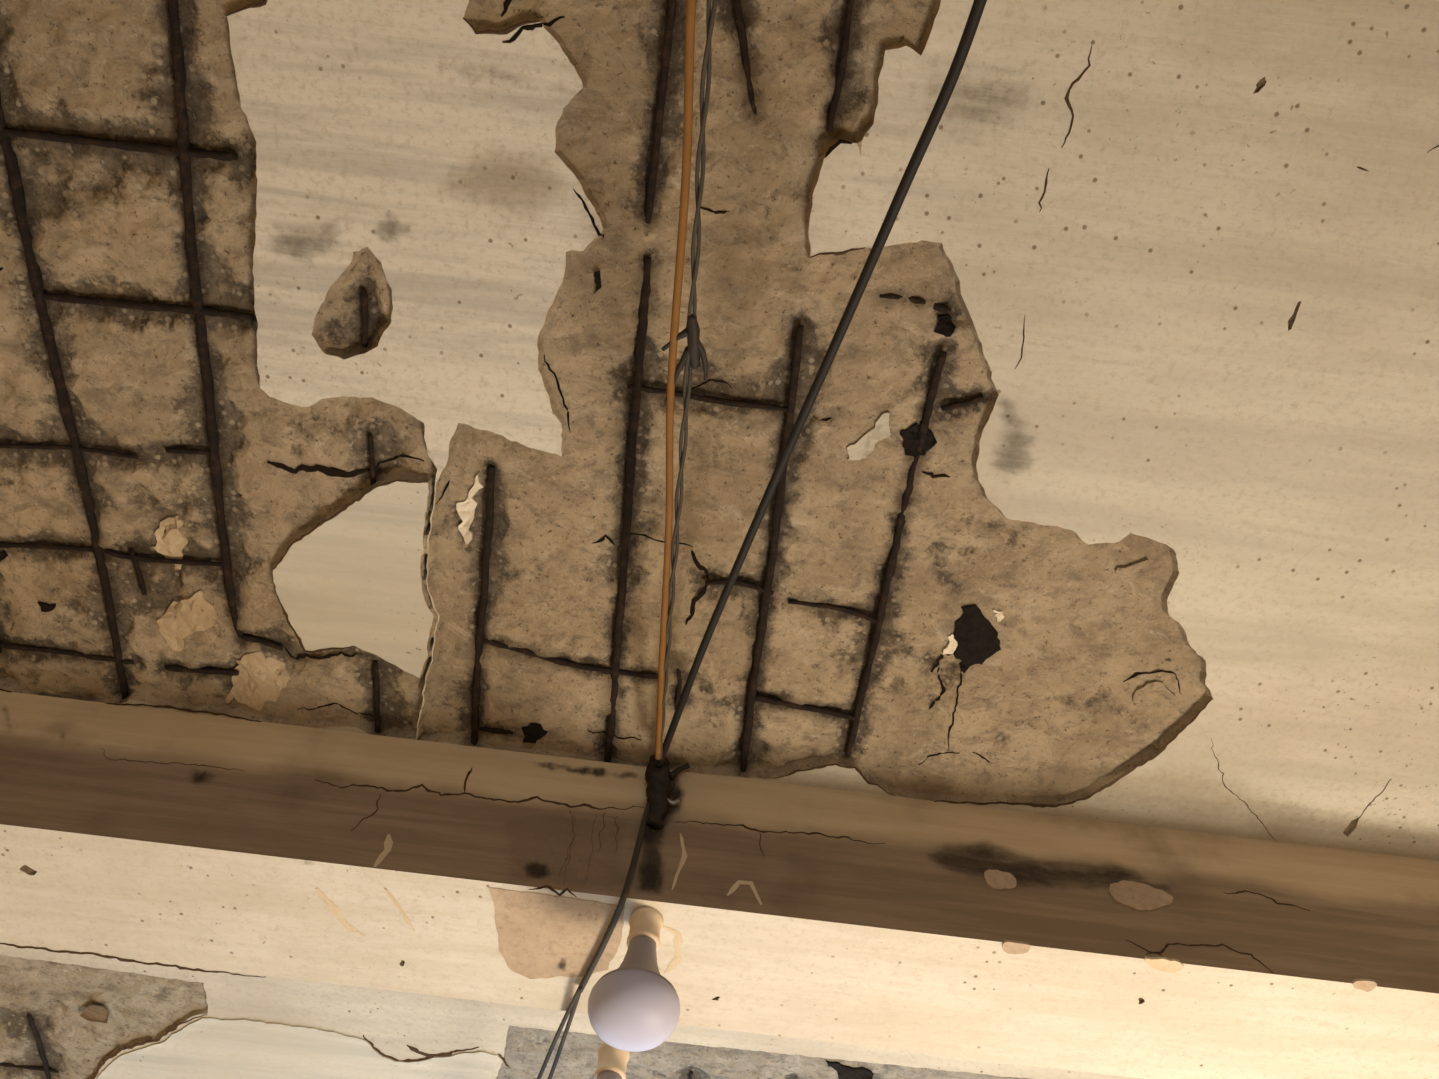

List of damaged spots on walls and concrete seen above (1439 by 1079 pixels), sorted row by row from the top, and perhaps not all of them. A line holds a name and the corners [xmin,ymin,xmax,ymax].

peeling [1253,77,1267,94]
crack [1038,46,1092,211]
crack [1015,317,1025,369]
spalling [0,0,1213,808]
crack [316,768,644,898]
crack [680,821,882,854]
damp [937,846,1133,885]
flaking render [489,821,625,979]
peeling [1144,956,1184,973]
spalling [0,955,604,1079]
spalling [625,1041,1031,1079]